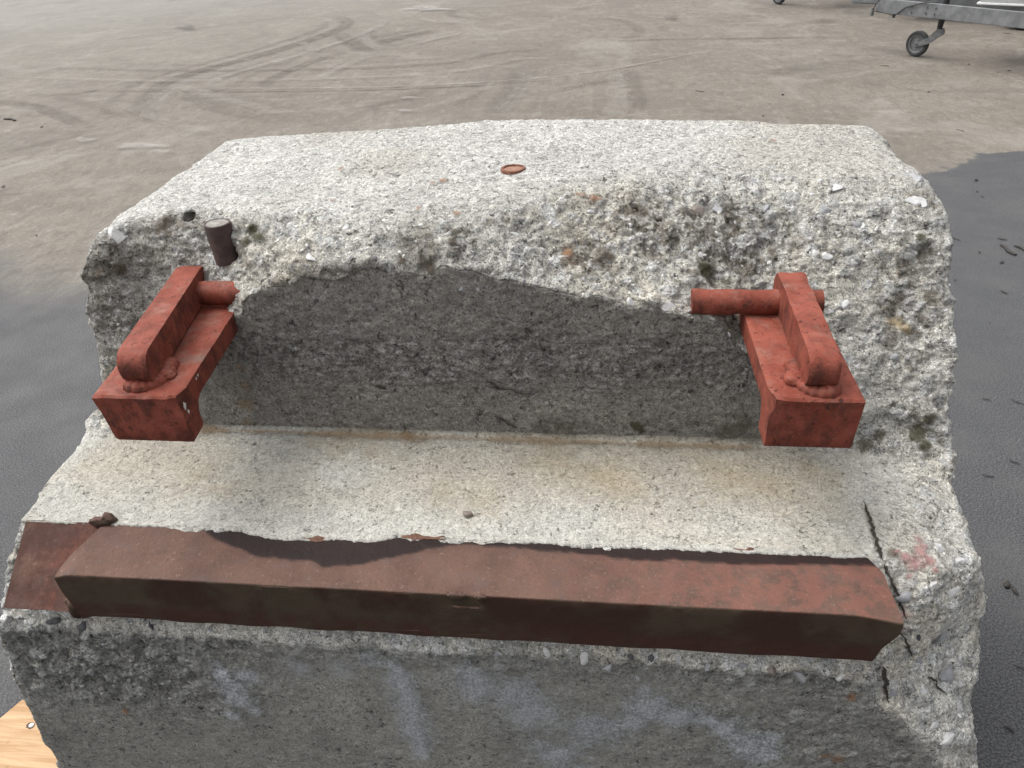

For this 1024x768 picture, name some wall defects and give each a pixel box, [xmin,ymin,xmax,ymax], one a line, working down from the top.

crack [863,501,912,656]
crack [882,667,890,702]